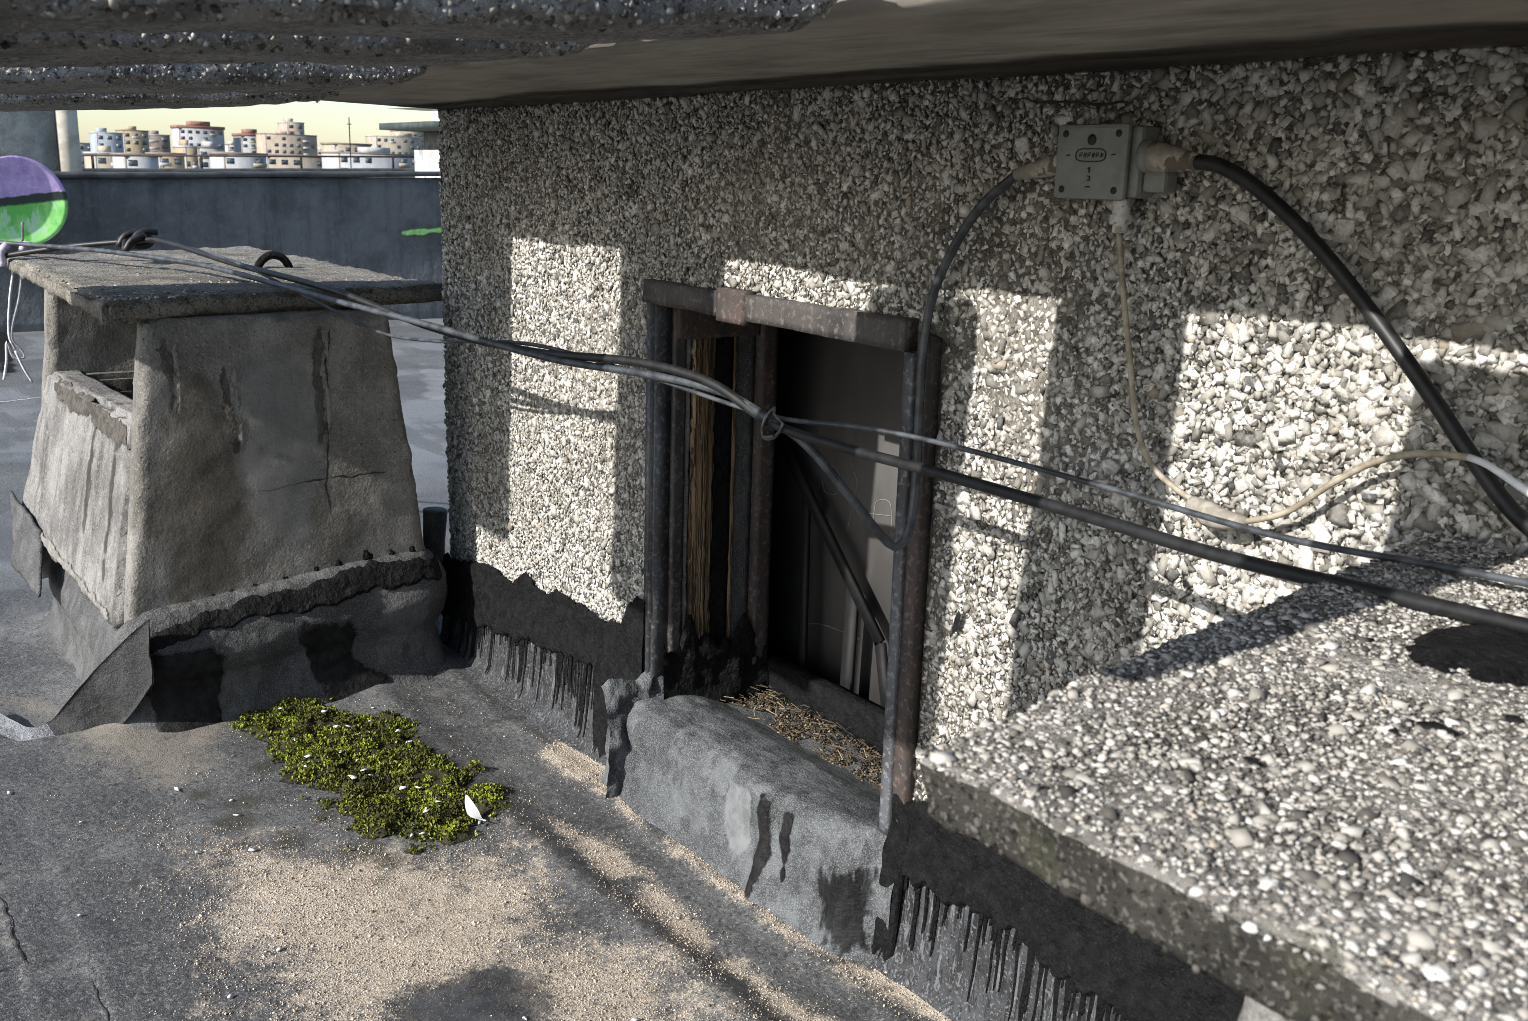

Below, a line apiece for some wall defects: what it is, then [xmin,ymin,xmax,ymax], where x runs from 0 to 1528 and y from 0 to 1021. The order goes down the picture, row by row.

crack [258,330,385,510]
crack [0,898,26,971]
crack [90,981,109,1021]